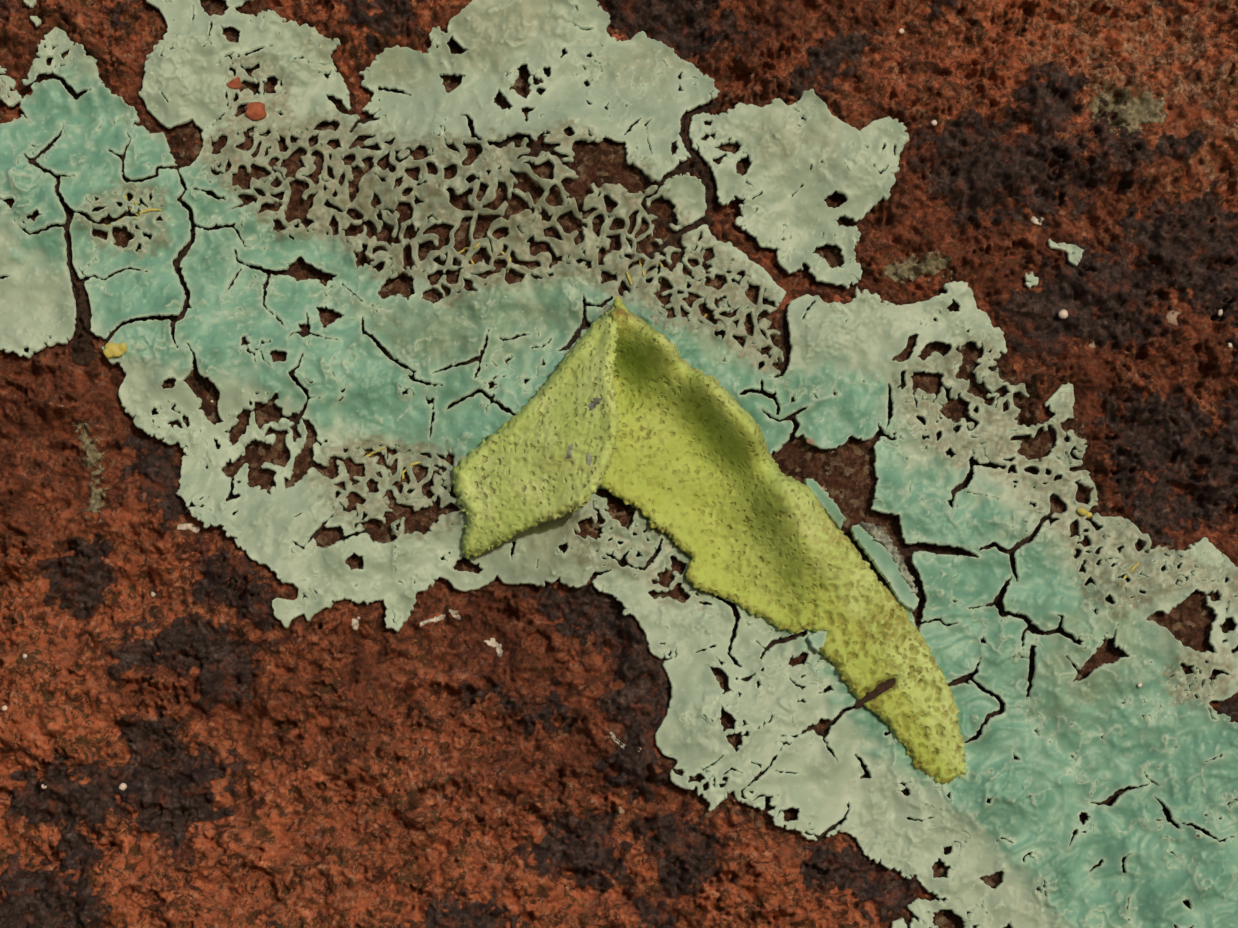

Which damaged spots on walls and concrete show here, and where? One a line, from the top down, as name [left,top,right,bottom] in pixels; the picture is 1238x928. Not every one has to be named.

peeling [92,229,108,240]
peeling [646,172,707,231]
crack [625,101,762,259]
peeling [689,89,909,289]
crack [20,133,613,437]
crack [739,301,815,443]
crack [948,457,1005,507]
peeling [670,556,686,575]
crack [657,593,807,682]
crack [899,510,1115,743]
peeling [734,803,775,829]
peeling [891,918,907,928]